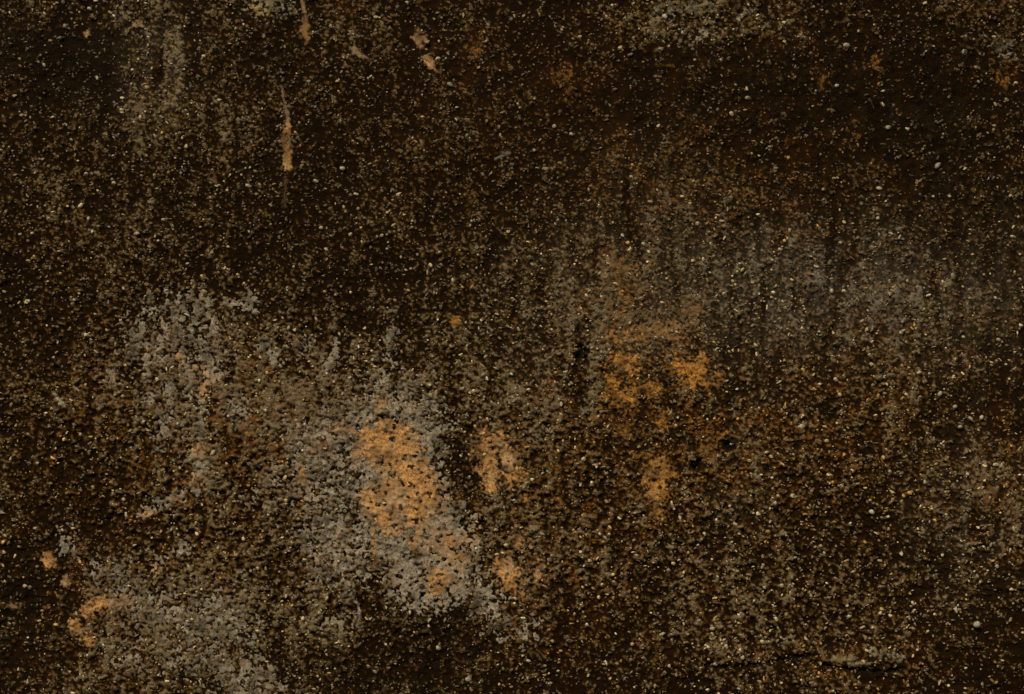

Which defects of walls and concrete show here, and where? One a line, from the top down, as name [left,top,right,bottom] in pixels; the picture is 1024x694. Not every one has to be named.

rust [280,85,294,189]
rust [595,251,726,522]
rust [327,392,450,568]
rust [469,425,529,502]
rust [420,532,469,605]